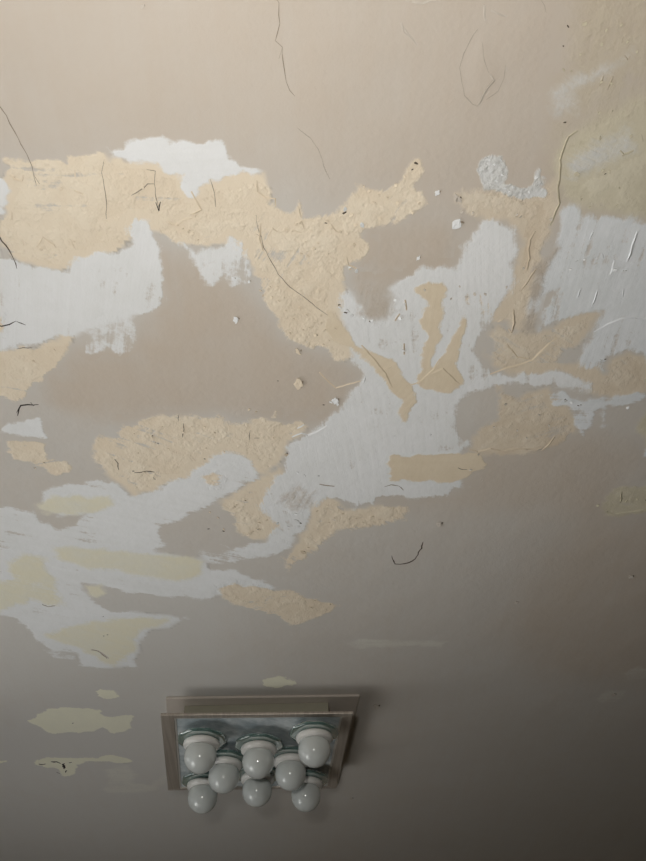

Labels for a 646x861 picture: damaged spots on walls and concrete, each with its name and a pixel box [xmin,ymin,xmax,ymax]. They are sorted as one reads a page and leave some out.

crack [275,0,294,95]
crack [0,107,39,186]
peeling [0,145,474,426]
peeling [497,240,570,342]
peeling [2,405,328,490]
peeling [383,437,555,486]
peeling [38,612,180,671]
peeling [213,579,348,629]
peeling [22,685,139,736]
peeling [28,752,143,779]